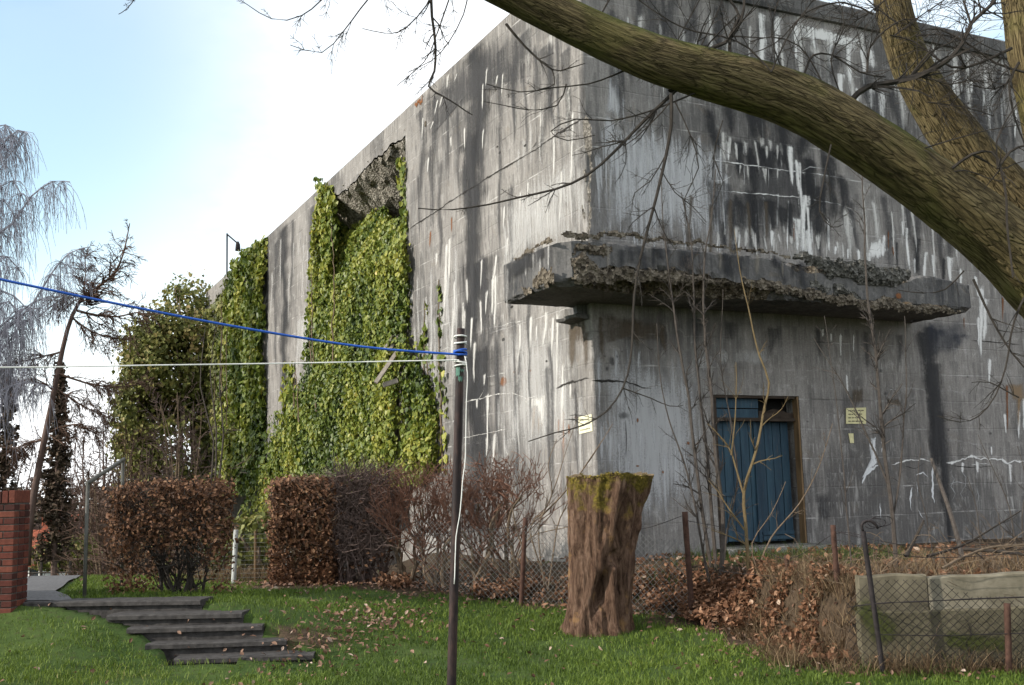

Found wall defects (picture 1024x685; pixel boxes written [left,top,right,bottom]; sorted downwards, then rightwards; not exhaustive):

leakage [749,11,906,129]
leakage [951,48,1017,159]
leakage [415,30,696,542]
spalling [514,115,961,315]
leakage [595,67,991,382]
leakage [893,325,1022,542]